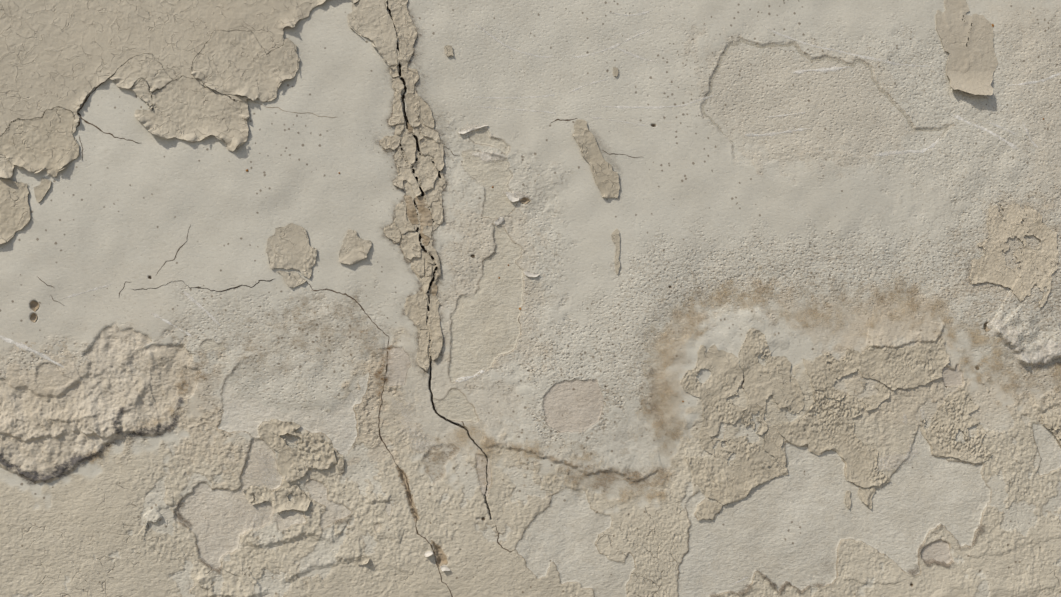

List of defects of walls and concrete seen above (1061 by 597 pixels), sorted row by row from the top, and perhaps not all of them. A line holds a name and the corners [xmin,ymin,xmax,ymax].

peeling [0,0,326,244]
peeling [935,0,998,95]
spalling [30,301,39,322]
peeling [266,223,317,287]
peeling [339,229,372,264]
crack [387,1,514,552]
peeling [348,0,664,497]
flaking render [0,324,200,484]
crack [307,282,453,597]
peeling [515,488,635,597]
peeling [678,409,991,597]
peeling [1033,415,1061,475]